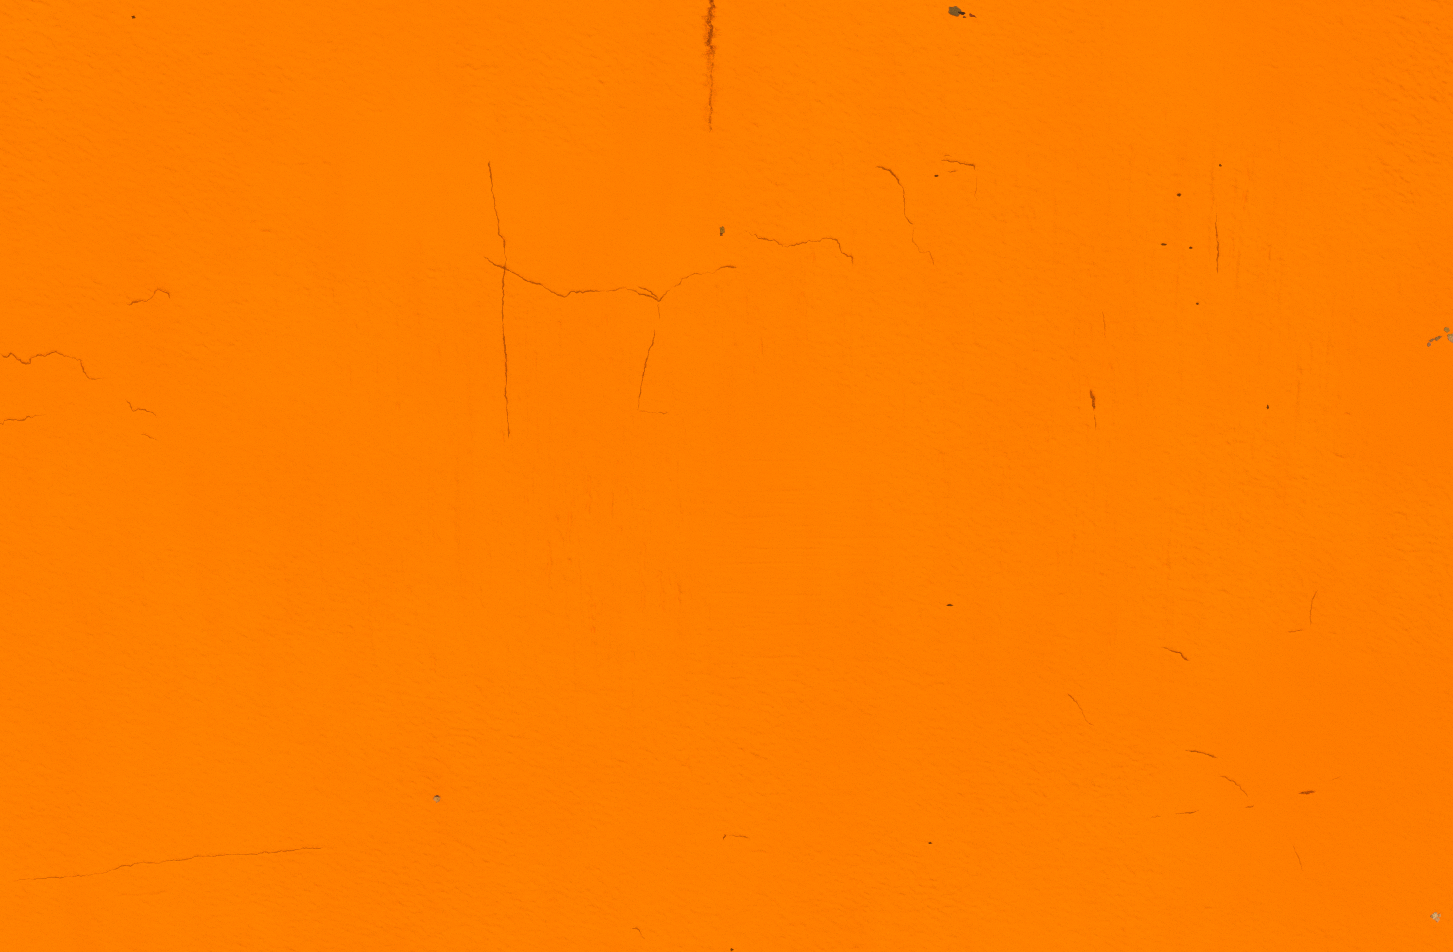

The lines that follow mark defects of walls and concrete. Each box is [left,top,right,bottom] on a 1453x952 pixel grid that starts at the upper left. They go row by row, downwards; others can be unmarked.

crack [707,0,715,45]
crack [493,232,588,434]